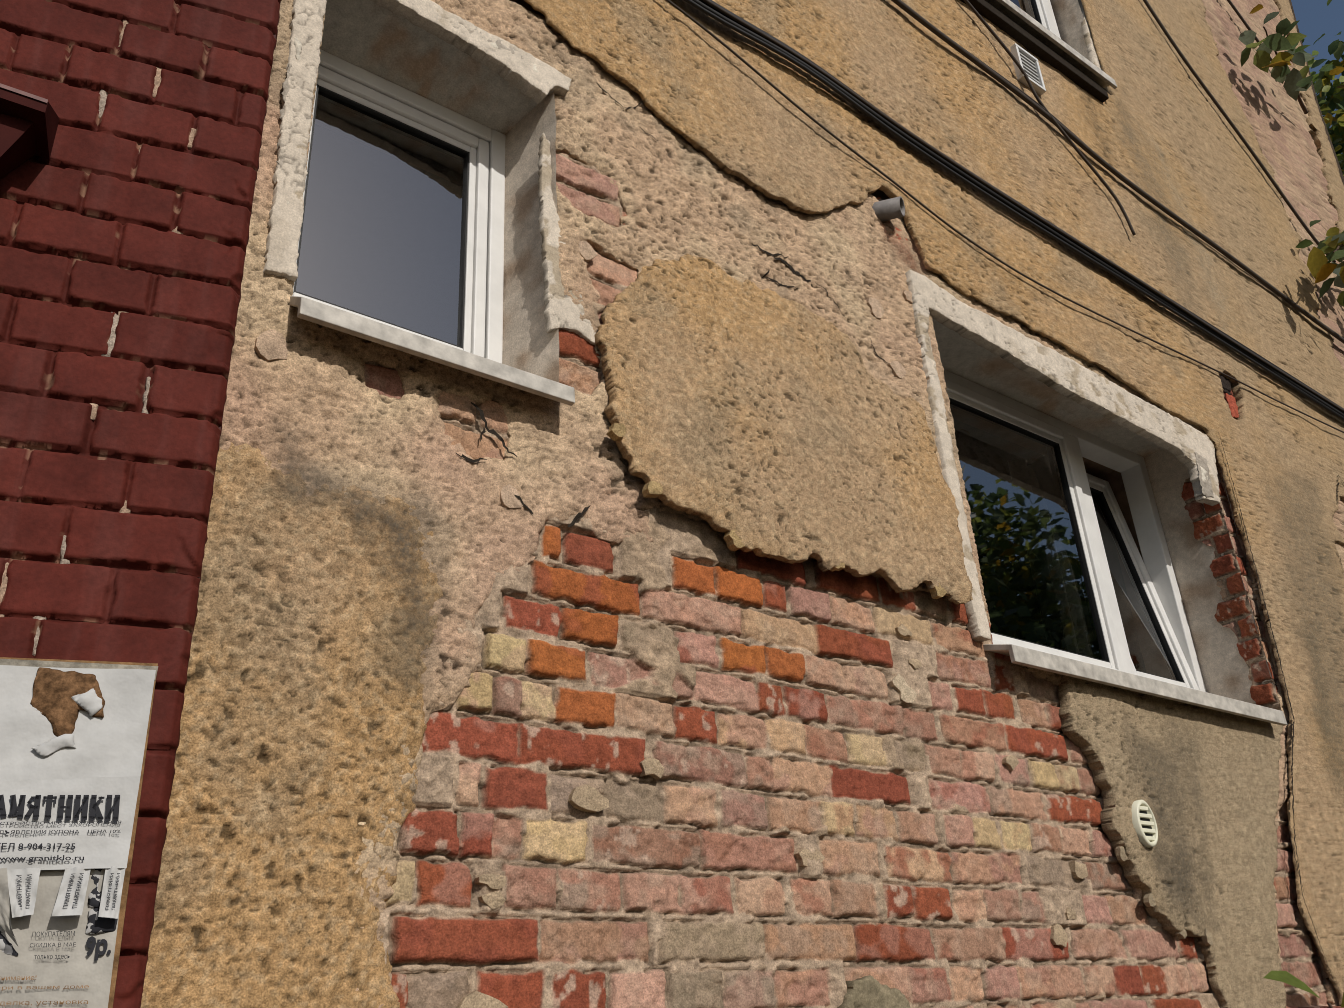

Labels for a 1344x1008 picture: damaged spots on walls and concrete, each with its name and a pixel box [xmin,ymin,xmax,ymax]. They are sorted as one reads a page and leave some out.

peeling [98,89,107,118]
peeling [152,67,162,98]
flaking render [1202,0,1344,370]
flaking render [431,0,1161,473]
peeling [101,311,129,357]
flaking render [219,0,704,724]
crack [456,402,517,463]
flaking render [928,314,991,628]
crack [514,495,533,514]
crack [568,505,591,527]
peeling [0,562,9,617]
spalling [354,447,1339,1008]